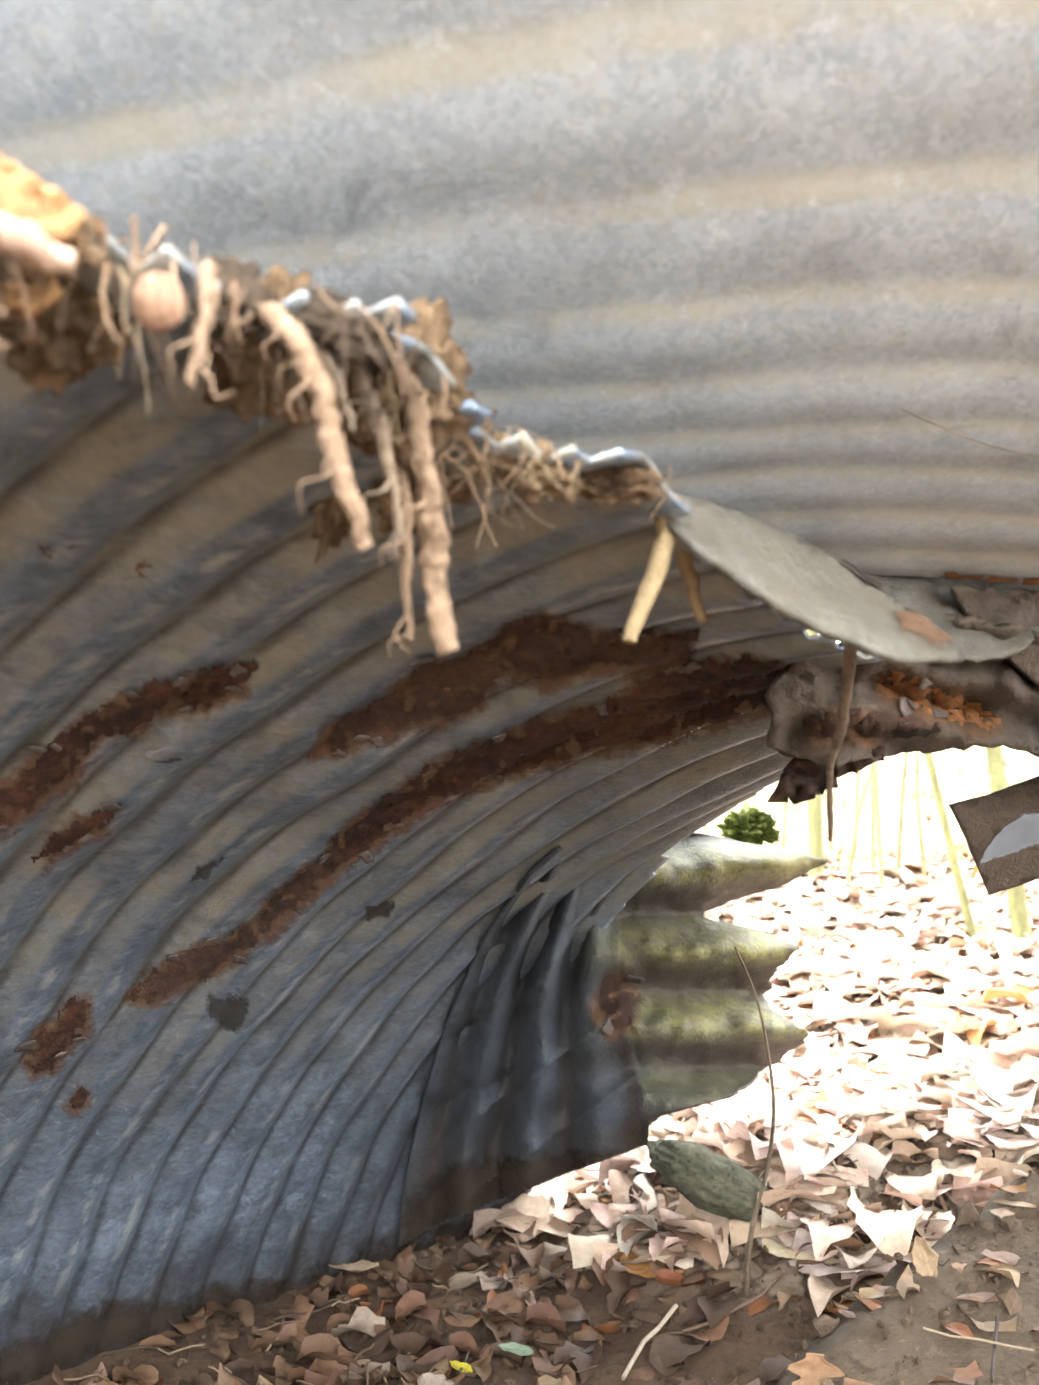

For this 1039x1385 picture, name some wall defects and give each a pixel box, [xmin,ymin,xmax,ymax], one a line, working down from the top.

rust [896,611,951,644]
rust [31,802,123,869]
rust [0,660,259,833]
rust [124,612,783,1009]
rust [767,671,1003,805]
rust [14,995,93,1079]